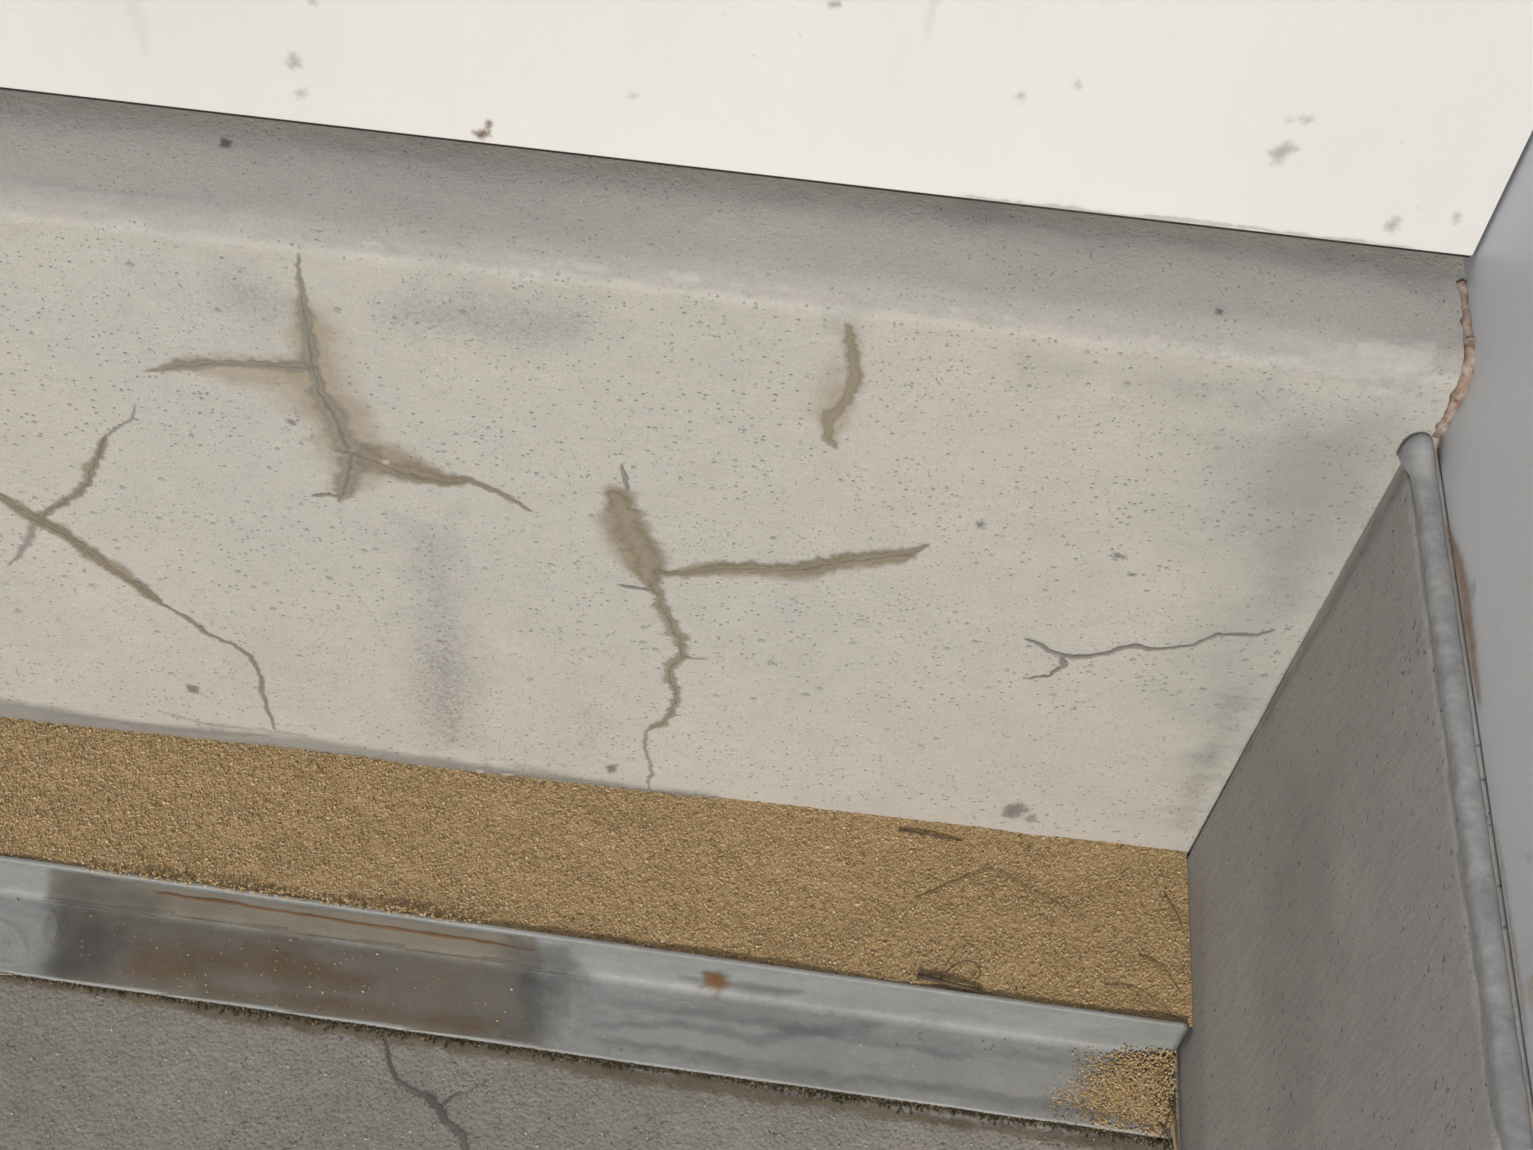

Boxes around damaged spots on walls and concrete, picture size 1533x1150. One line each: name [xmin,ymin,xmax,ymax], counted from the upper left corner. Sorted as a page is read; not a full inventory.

crack [146,256,531,512]
crack [822,325,861,449]
crack [0,436,275,729]
crack [606,465,928,731]
crack [1024,630,1274,679]
rust [705,974,722,987]
crack [383,1043,489,1150]